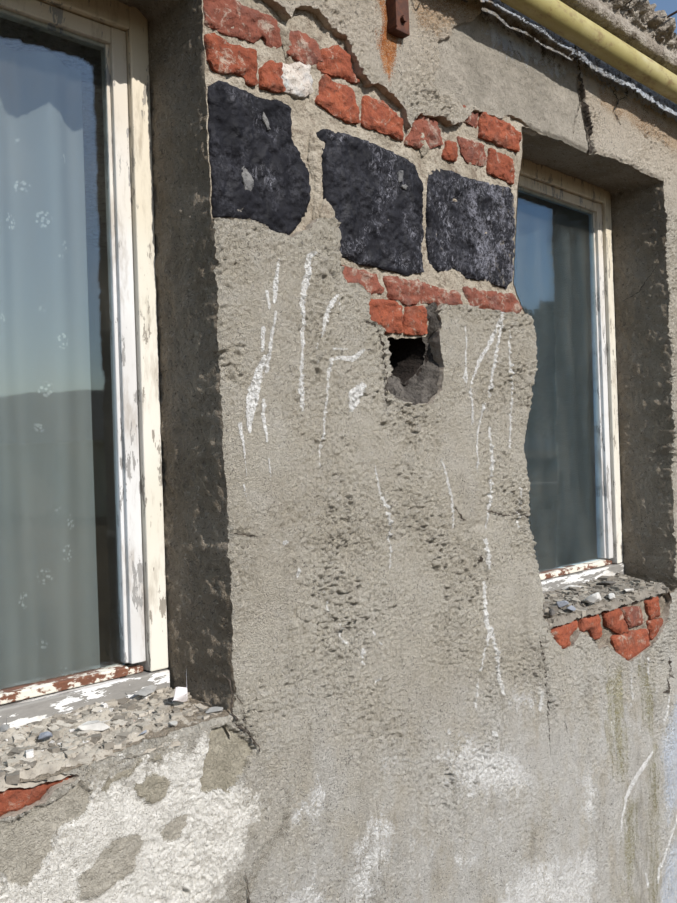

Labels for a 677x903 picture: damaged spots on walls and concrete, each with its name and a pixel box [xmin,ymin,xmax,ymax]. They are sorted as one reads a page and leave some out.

rust [375,0,401,83]
crack [573,46,594,154]
flaking render [201,0,677,405]
flaking render [543,594,667,661]
crack [223,674,260,756]
peeling [200,724,253,794]